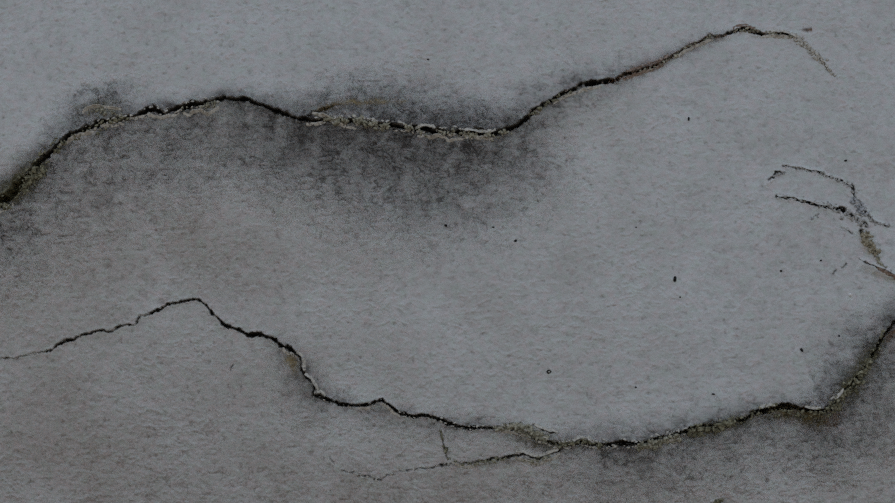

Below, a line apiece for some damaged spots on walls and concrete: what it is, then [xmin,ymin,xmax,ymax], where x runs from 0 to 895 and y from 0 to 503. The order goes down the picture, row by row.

crack [0,24,837,213]
crack [769,162,895,280]
crack [41,298,895,481]